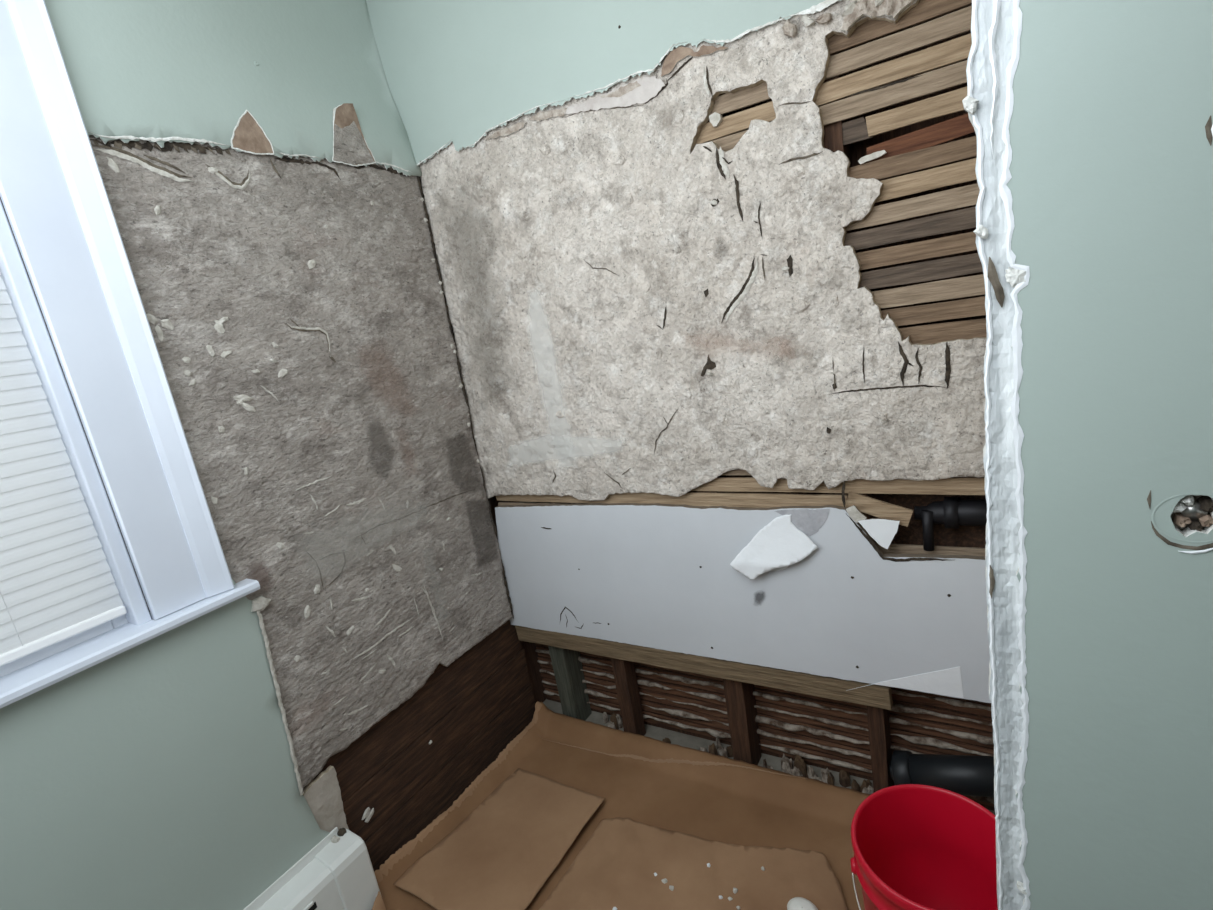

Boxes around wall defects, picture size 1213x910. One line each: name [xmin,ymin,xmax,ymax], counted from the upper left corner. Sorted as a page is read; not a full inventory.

flaking render [88,0,1031,910]
spalling [1172,495,1213,531]